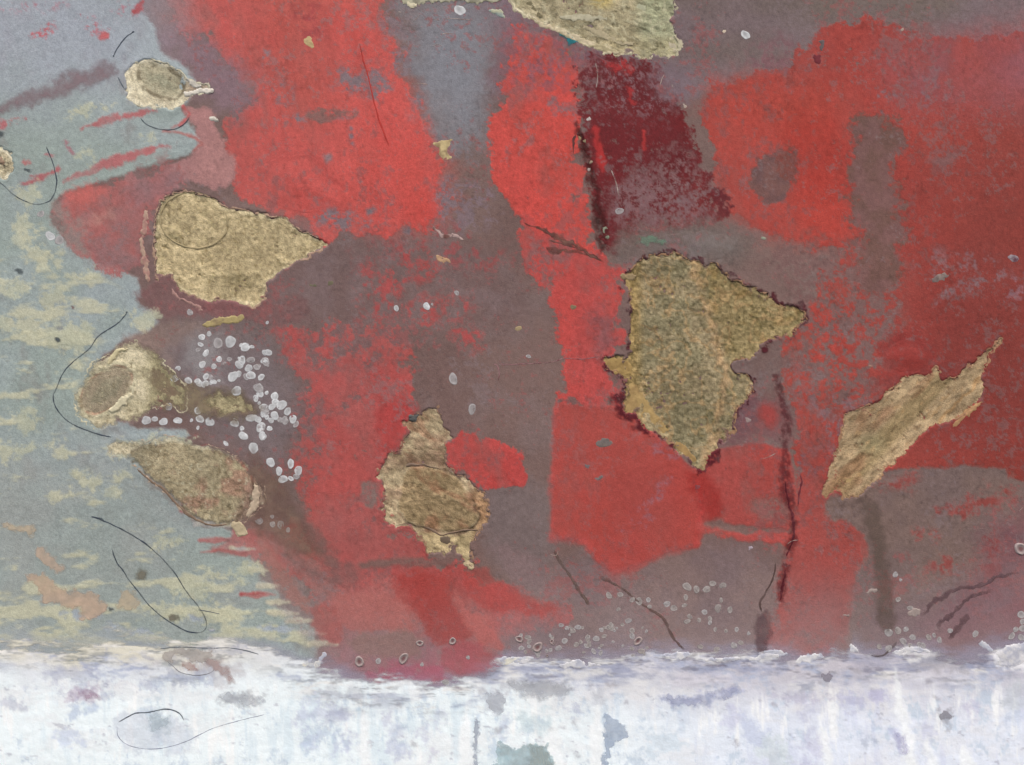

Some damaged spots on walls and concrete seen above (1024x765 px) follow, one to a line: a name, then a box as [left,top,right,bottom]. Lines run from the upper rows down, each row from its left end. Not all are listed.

spalling [402,0,683,59]
spalling [125,58,214,110]
spalling [139,189,328,328]
spalling [74,339,188,429]
spalling [206,391,253,414]
spalling [603,250,808,470]
spalling [822,337,1003,501]
spalling [108,434,266,537]
spalling [376,405,491,570]
crack [554,552,588,604]
crack [605,579,682,648]
crack [759,475,803,611]